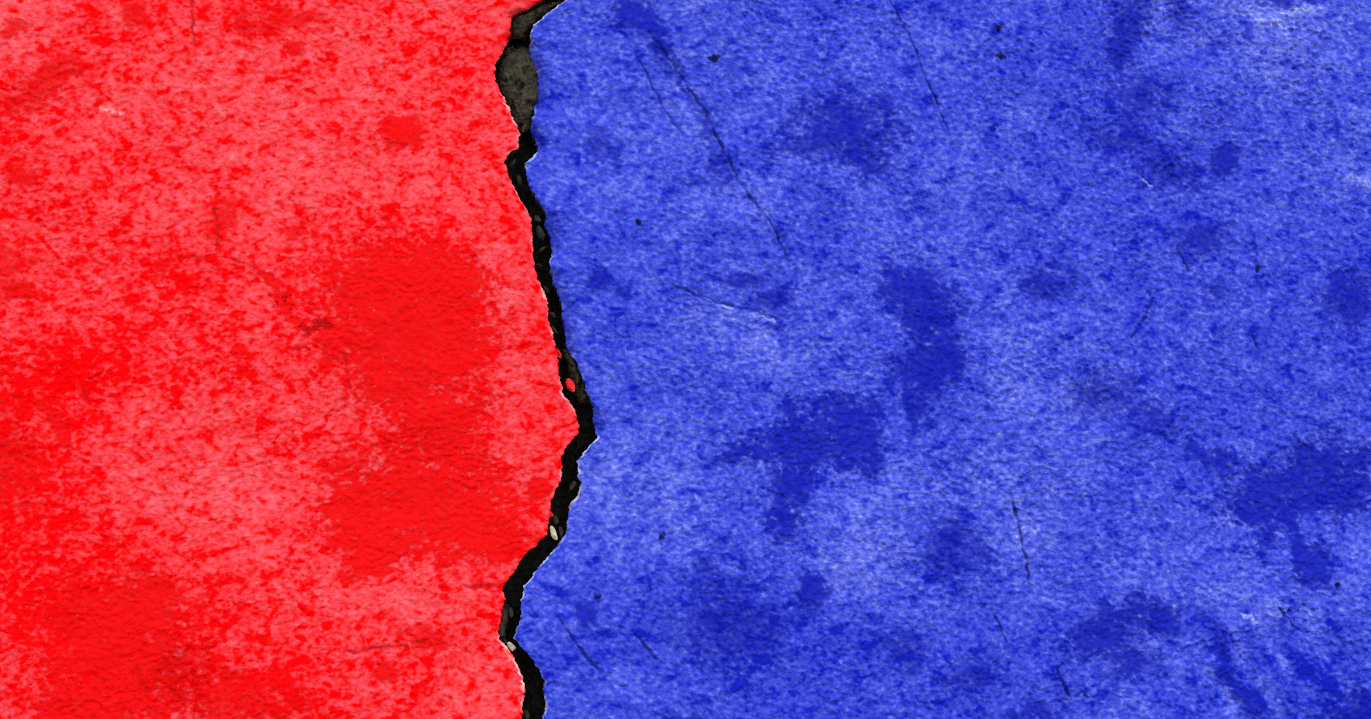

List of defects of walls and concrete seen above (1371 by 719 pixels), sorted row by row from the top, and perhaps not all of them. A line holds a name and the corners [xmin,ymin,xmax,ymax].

crack [467,0,599,719]